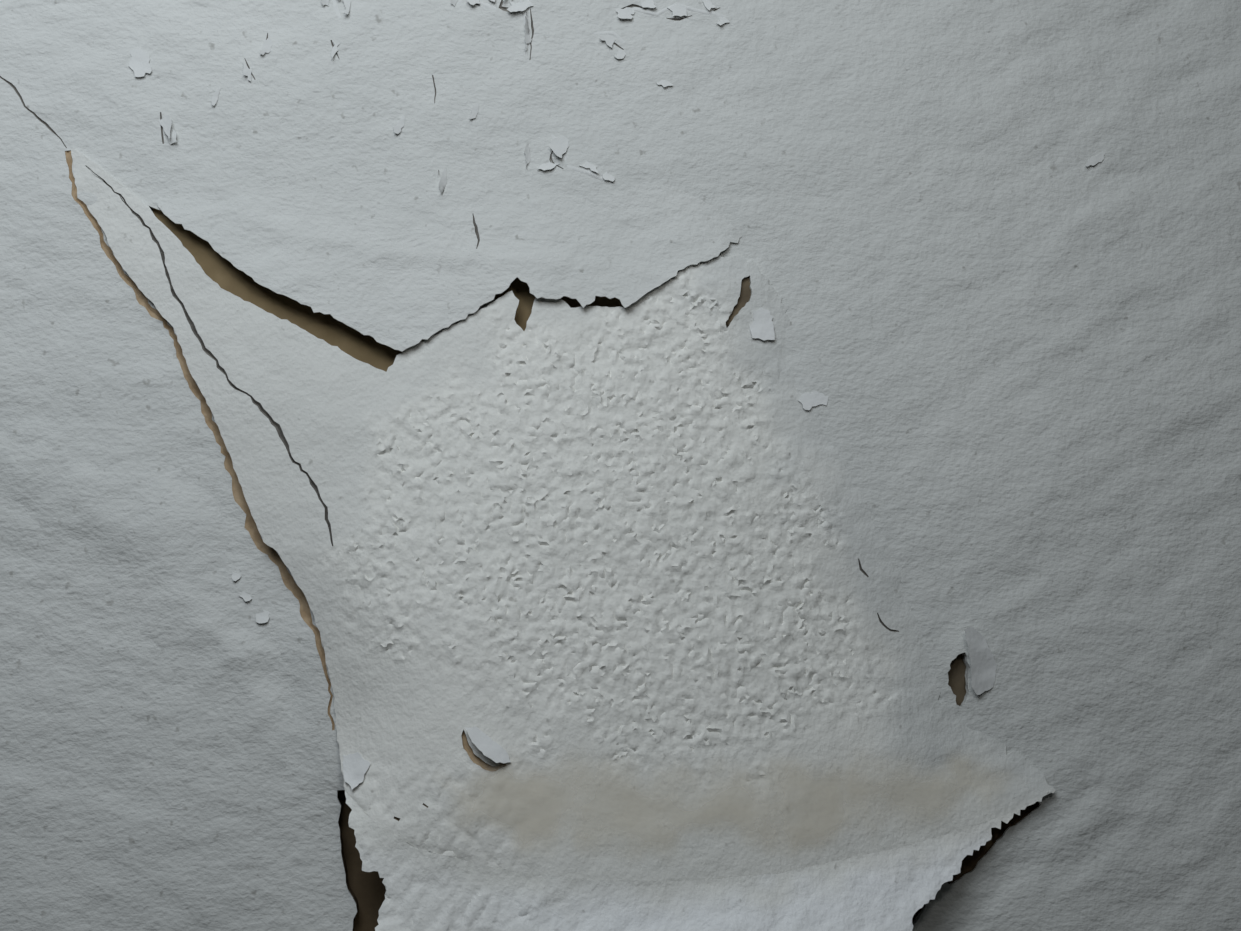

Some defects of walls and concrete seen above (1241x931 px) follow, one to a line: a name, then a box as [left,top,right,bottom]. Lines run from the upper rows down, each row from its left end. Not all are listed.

crack [0,76,335,730]
flaking render [71,135,1056,931]